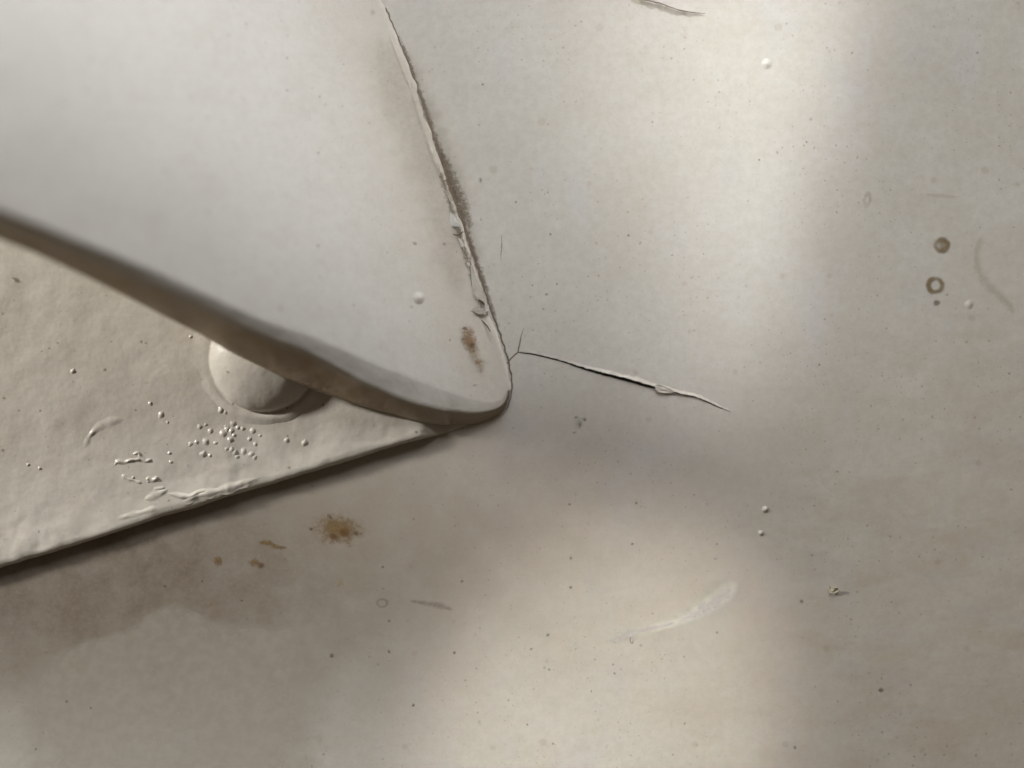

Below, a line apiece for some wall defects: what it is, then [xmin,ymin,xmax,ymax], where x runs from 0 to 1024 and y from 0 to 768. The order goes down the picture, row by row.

crack [631,0,705,17]
peeling [388,32,492,343]
leakage [926,278,943,303]
crack [507,331,731,412]